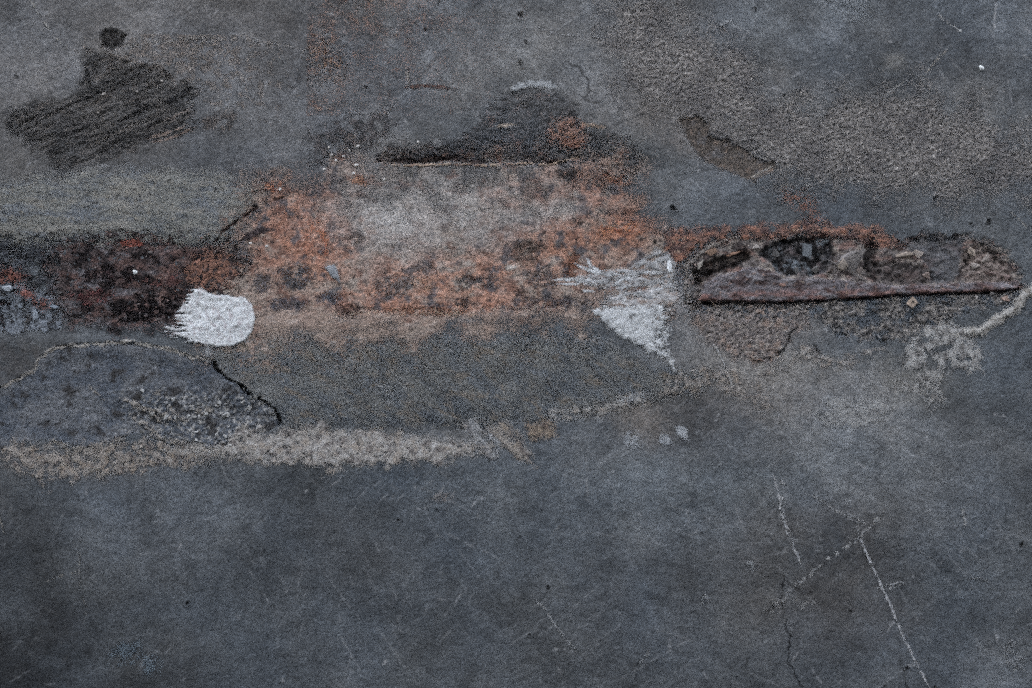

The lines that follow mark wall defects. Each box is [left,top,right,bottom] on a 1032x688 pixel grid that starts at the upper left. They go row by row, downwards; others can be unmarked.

spalling [377,142,592,180]
spalling [0,247,67,334]
corrosion [0,148,898,374]
corrosion [699,267,1019,302]
spalling [0,339,643,486]